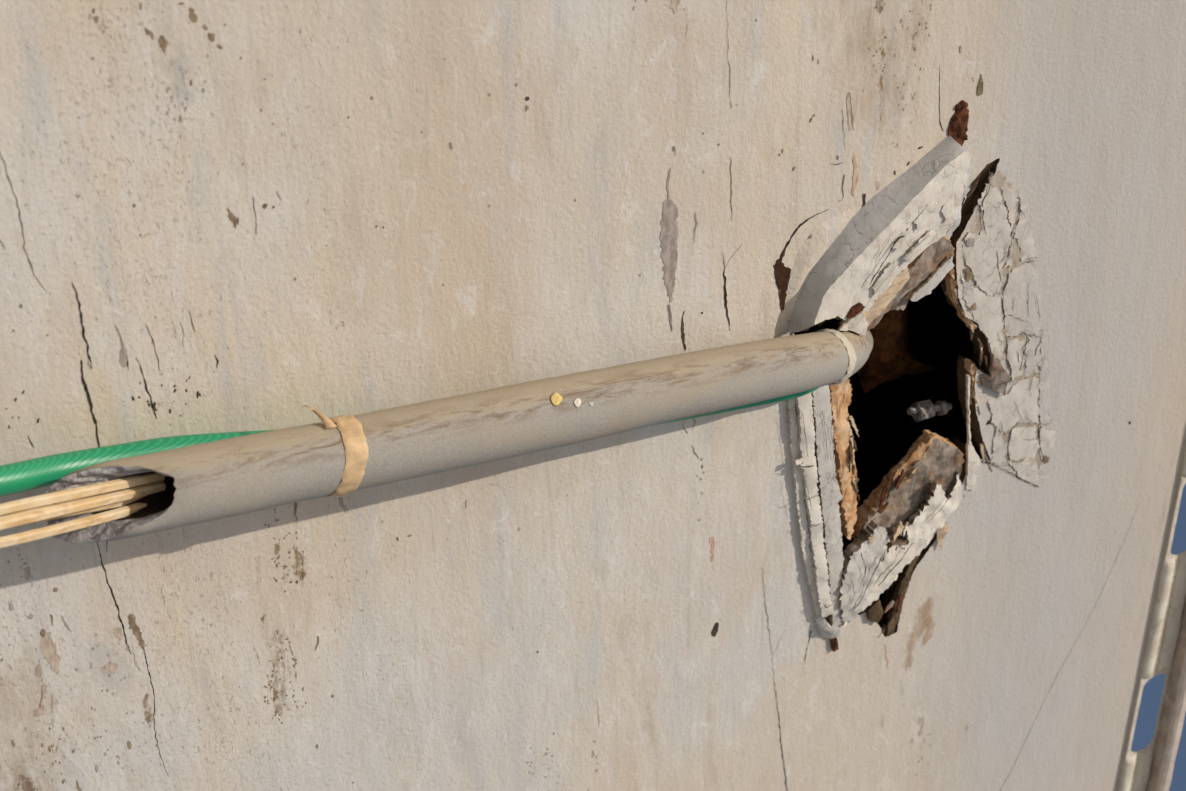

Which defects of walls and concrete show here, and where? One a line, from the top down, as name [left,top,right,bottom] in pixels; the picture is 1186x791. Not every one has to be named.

peeling [842,92,854,144]
peeling [852,156,880,207]
peeling [794,280,869,336]
peeling [848,171,1056,507]
spalling [841,533,854,554]
peeling [936,521,949,549]
crack [97,541,168,774]